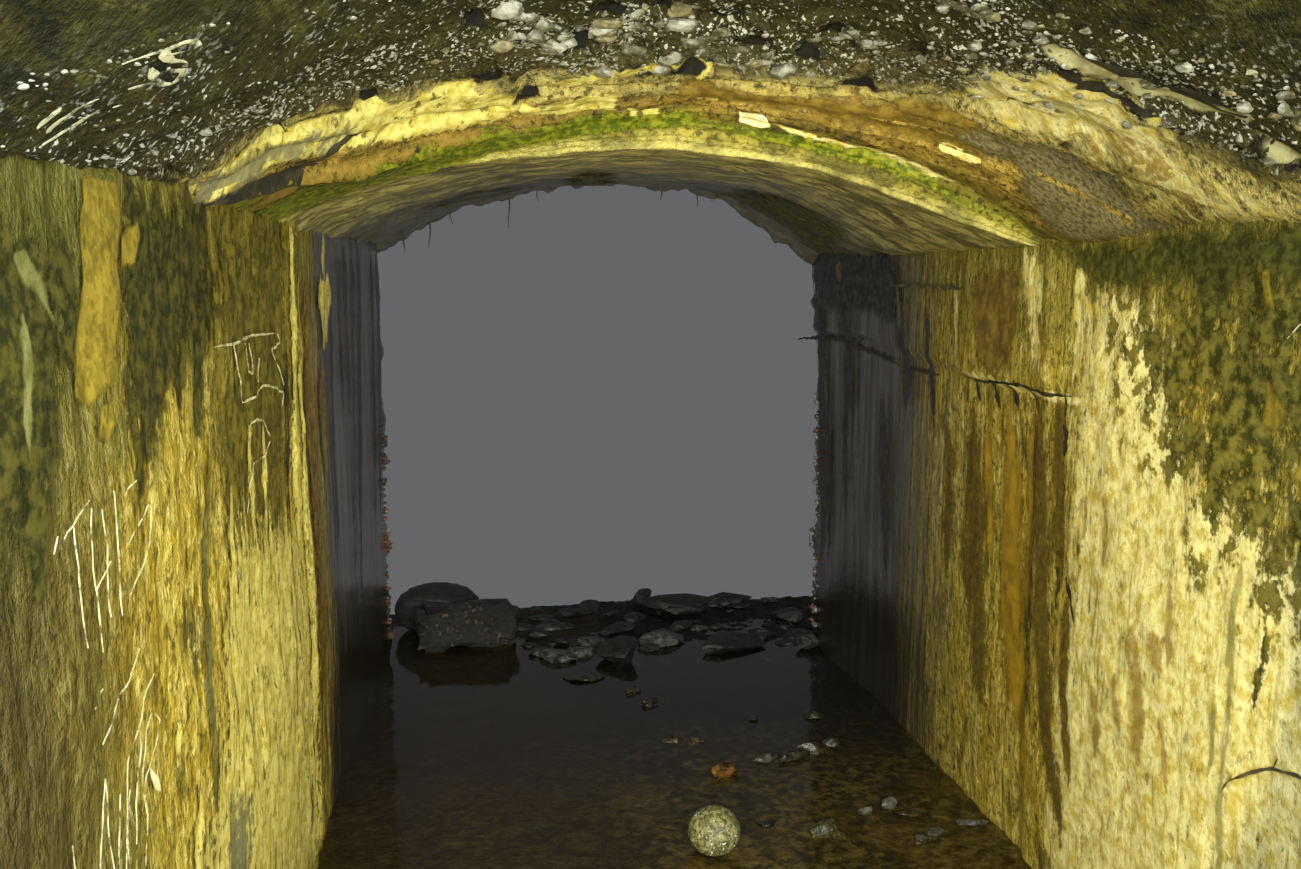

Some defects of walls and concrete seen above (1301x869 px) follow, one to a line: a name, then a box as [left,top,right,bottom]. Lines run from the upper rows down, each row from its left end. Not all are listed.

spalling [16,0,1301,443]
damp [774,124,970,190]
damp [939,142,981,163]
damp [1022,246,1043,373]
damp [318,231,382,598]
damp [809,252,935,582]
crack [798,314,1072,497]
damp [943,407,991,706]
crack [1055,552,1074,623]
damp [953,268,1301,869]
crack [1220,759,1301,792]